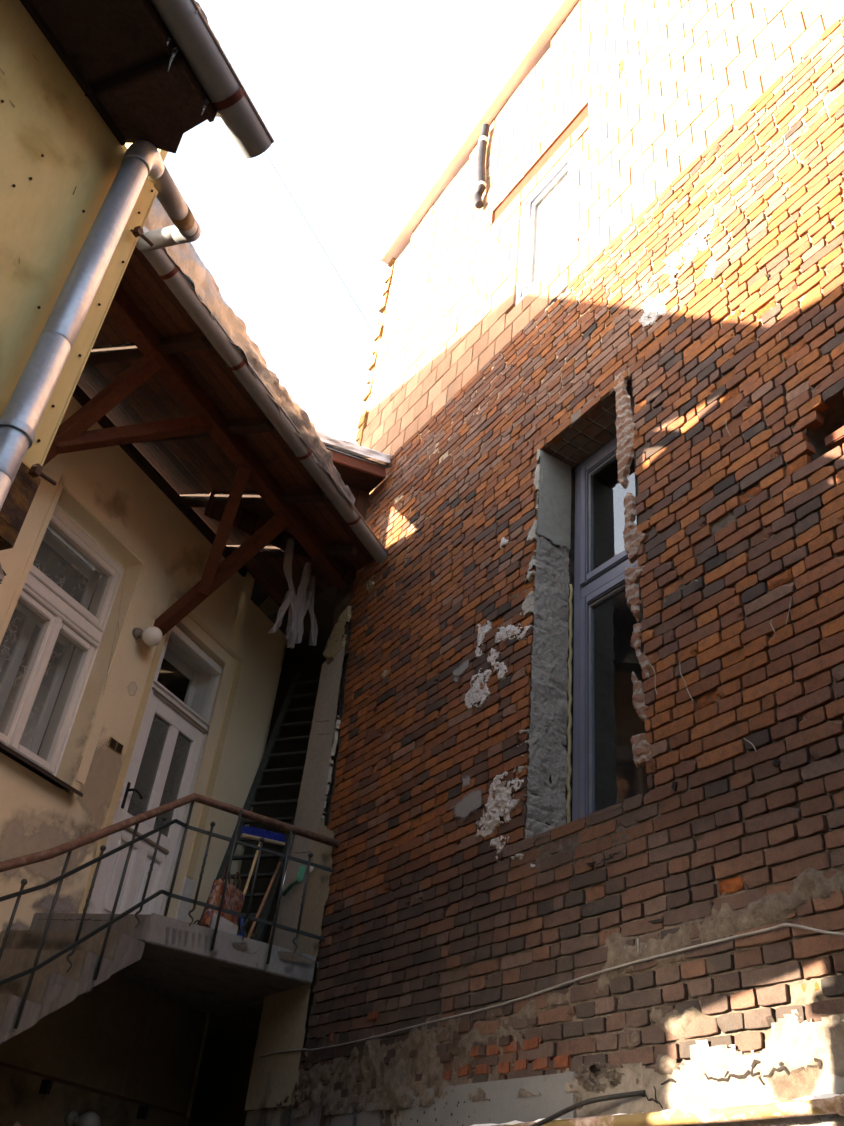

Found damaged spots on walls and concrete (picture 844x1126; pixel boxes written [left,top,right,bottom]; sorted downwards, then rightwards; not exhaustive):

peeling [703,258,718,279]
peeling [638,267,680,332]
spalling [786,399,844,476]
spalling [464,449,543,709]
spalling [614,370,655,768]
damp [0,742,122,883]
spalling [718,876,744,896]
crack [642,1078,677,1108]
crack [704,1058,821,1086]
spalling [771,1063,819,1100]
peeling [818,1115,844,1126]